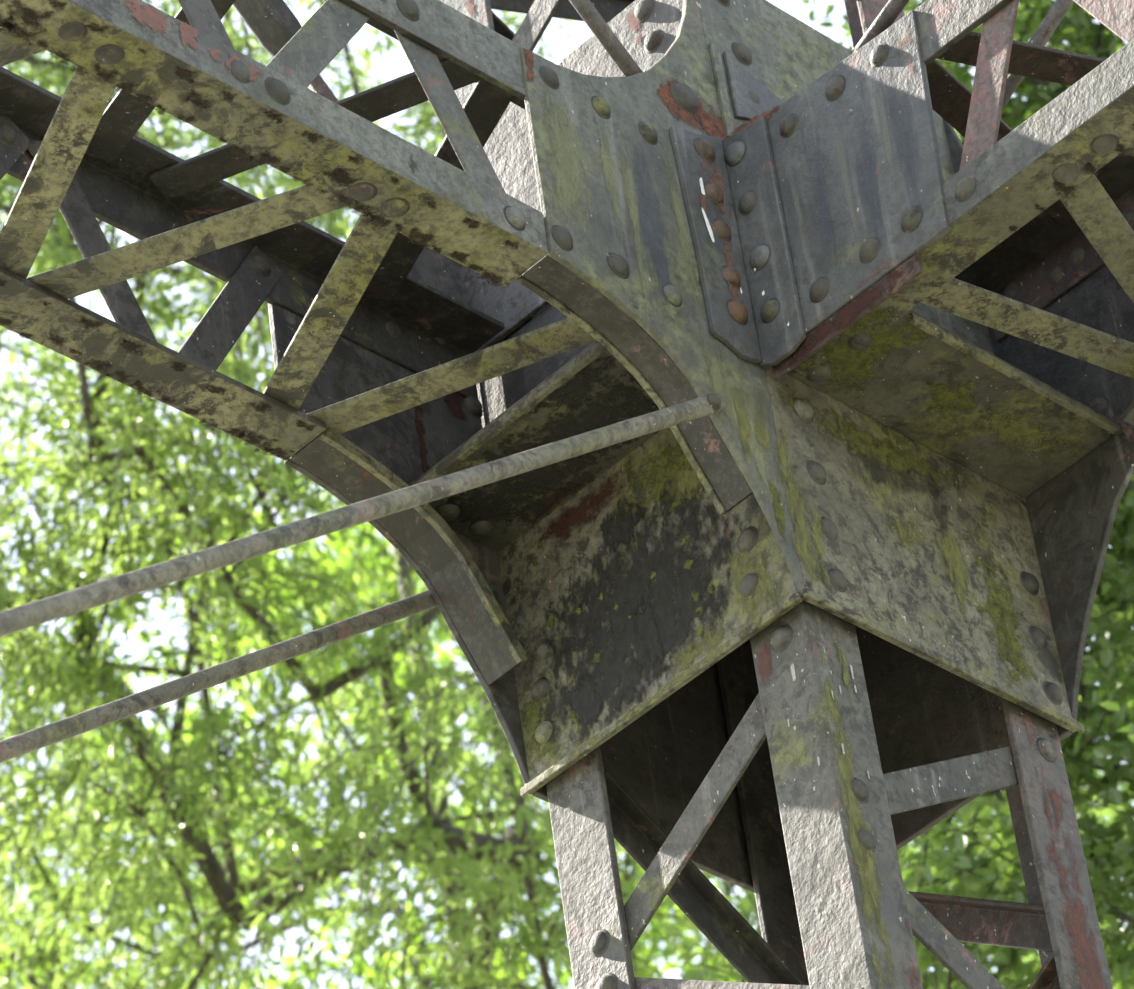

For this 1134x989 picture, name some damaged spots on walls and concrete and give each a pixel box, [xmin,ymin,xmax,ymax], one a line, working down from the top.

rust [0,0,236,123]
rust [301,131,324,144]
rust [657,79,779,139]
rust [219,138,502,287]
damp [482,356,659,463]
damp [443,438,637,527]
rust [534,466,633,547]
damp [770,481,786,543]
damp [848,449,969,614]
damp [539,481,741,746]